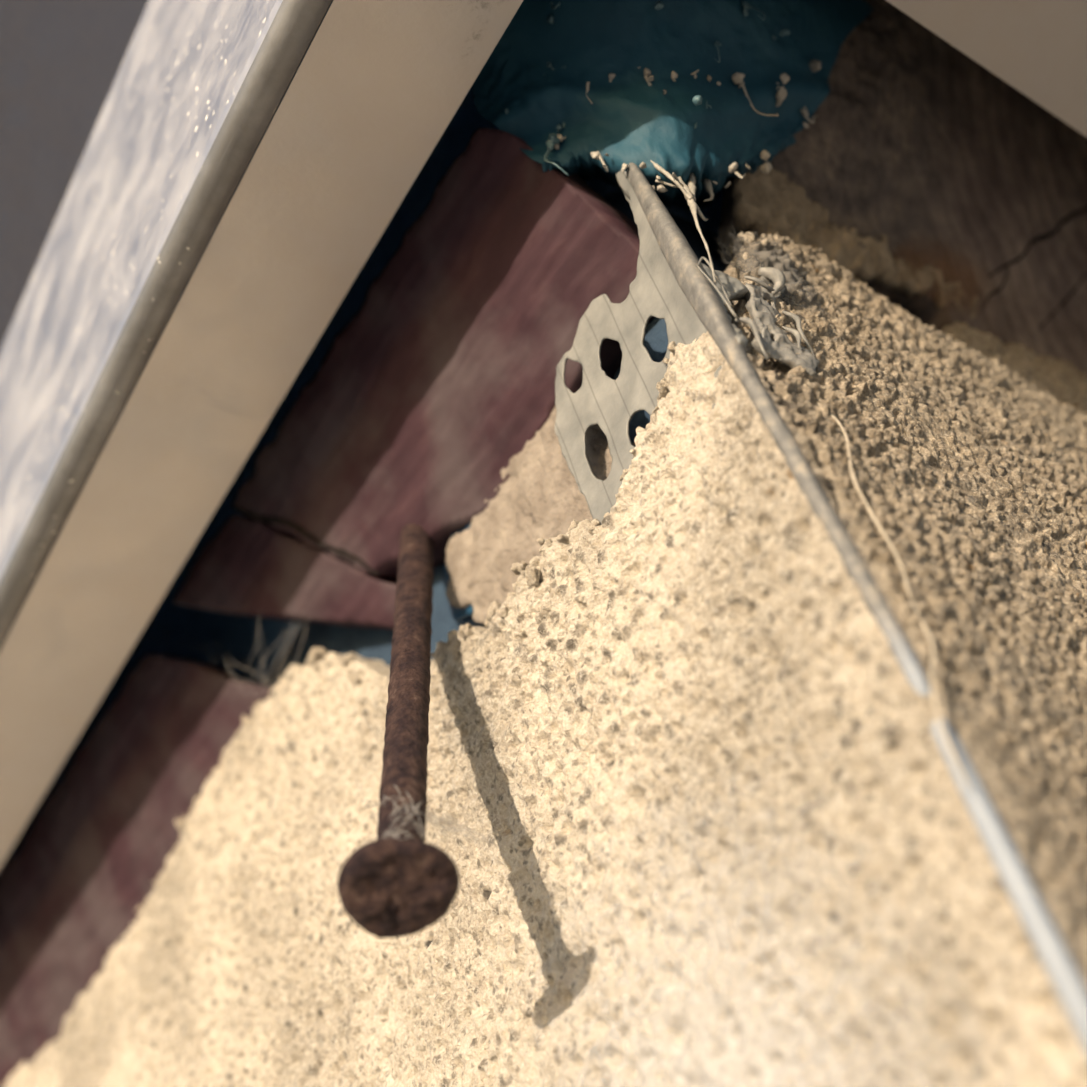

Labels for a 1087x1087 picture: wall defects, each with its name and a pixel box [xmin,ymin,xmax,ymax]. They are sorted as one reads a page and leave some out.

spalling [736,232,781,268]
crack [982,207,1087,309]
spalling [662,341,676,364]
spalling [650,378,670,424]
crack [232,505,378,575]
spalling [485,512,610,627]
spalling [431,623,473,660]